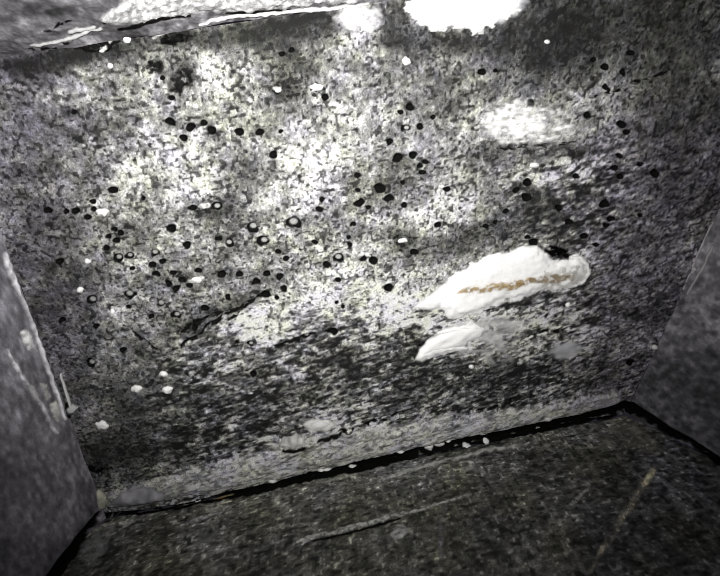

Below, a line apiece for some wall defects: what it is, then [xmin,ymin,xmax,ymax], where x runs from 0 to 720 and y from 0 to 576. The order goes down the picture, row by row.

crack [177,289,269,348]
water stain [413,246,590,361]
rust [459,275,570,293]